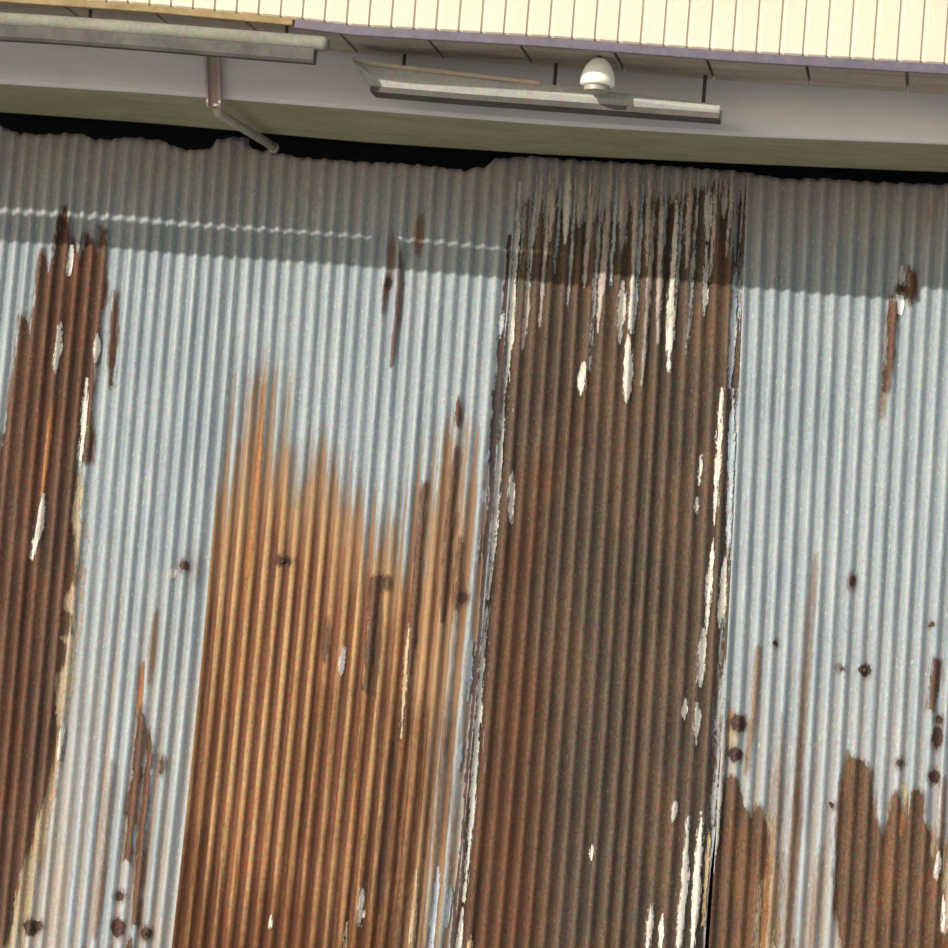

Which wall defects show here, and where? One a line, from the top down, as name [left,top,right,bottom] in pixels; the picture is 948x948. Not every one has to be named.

rust [880,265,917,411]
rust [0,207,119,948]
rust [168,561,189,580]
rust [172,166,808,948]
rust [858,664,871,677]
rust [925,657,943,750]
rust [829,751,948,948]